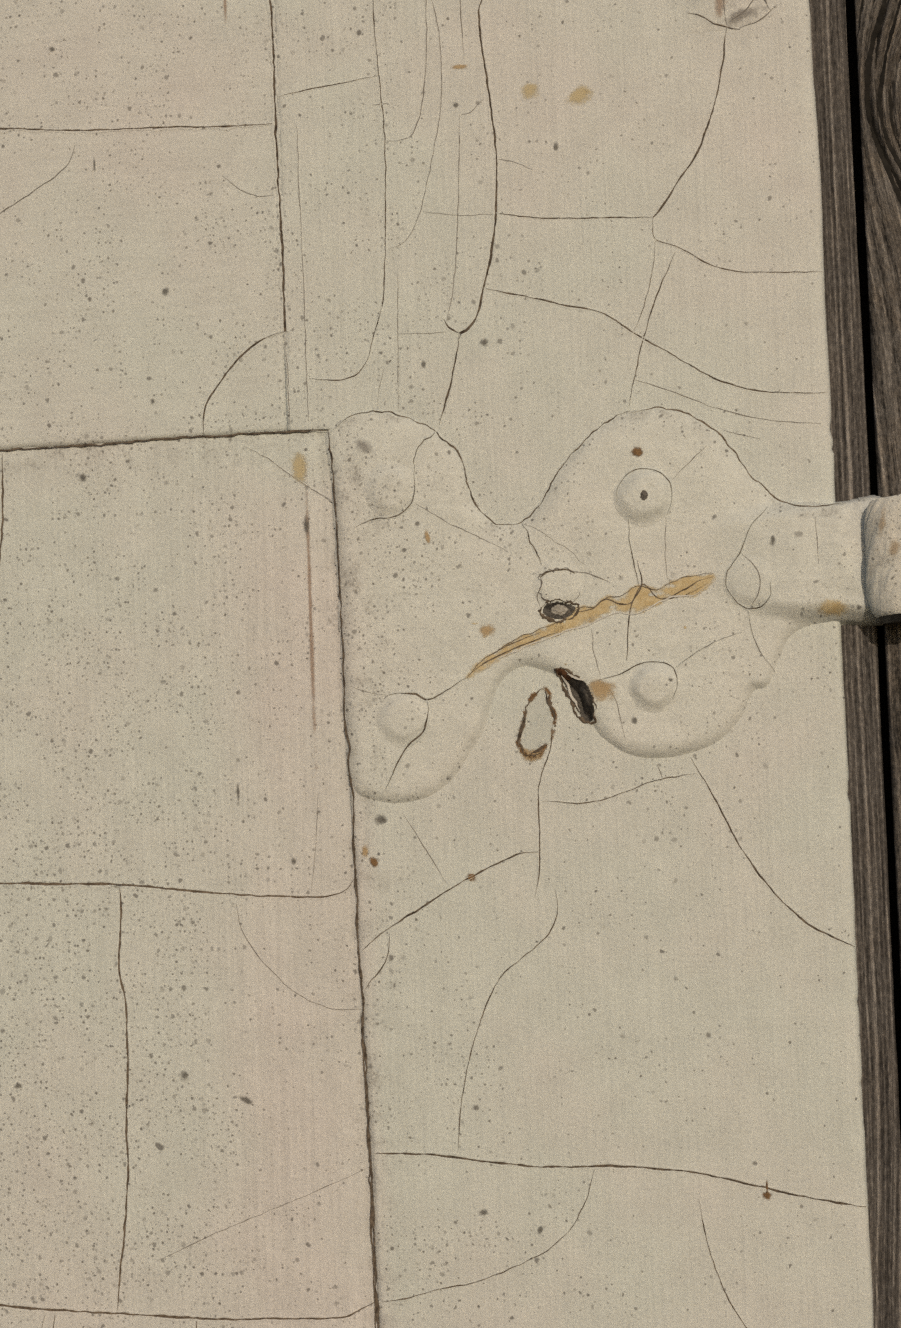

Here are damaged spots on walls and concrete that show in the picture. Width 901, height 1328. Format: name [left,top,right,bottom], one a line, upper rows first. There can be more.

crack [0,0,291,434]
crack [279,0,443,420]
crack [439,0,829,425]
peeling [468,560,714,677]
crack [0,405,868,1328]